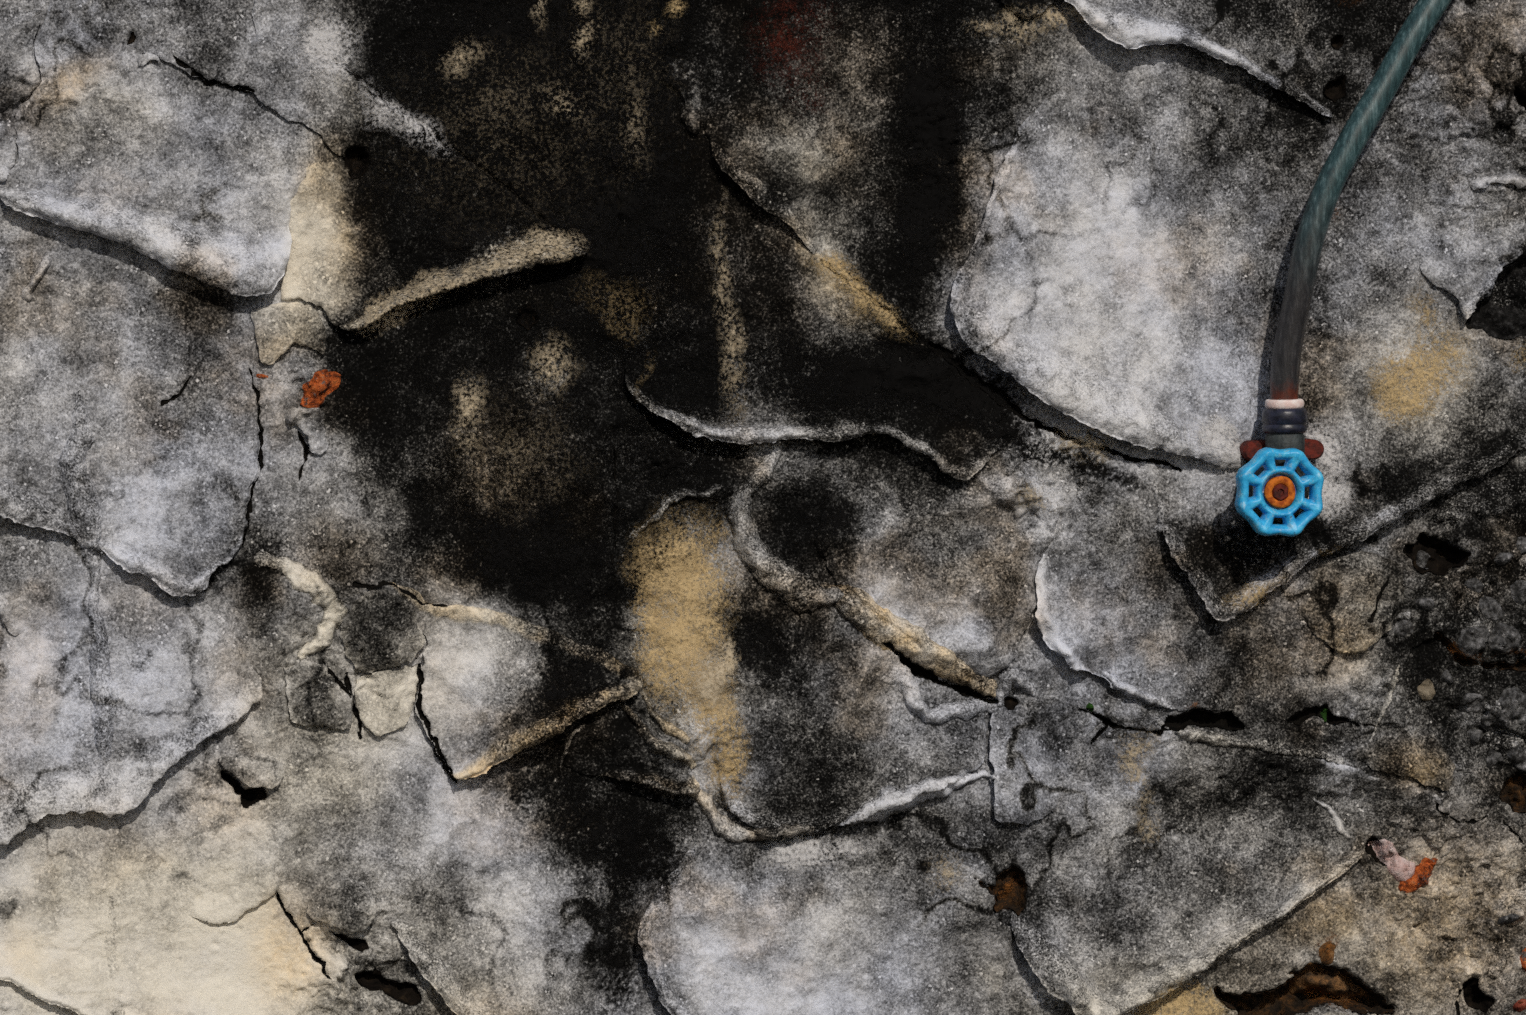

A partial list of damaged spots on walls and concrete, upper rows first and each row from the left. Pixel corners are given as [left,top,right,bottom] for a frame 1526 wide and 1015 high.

crack [161,375,191,406]
peeling [0,0,587,845]
leakage [301,0,1150,797]
peeling [814,420,1526,711]
crack [416,663,458,783]
crack [276,891,331,979]
leakage [494,757,686,1015]
leakage [764,834,866,871]
peeling [925,719,1456,1015]
spalling [1463,978,1495,1012]
spalling [1499,773,1526,813]
flaking render [1513,999,1526,1012]